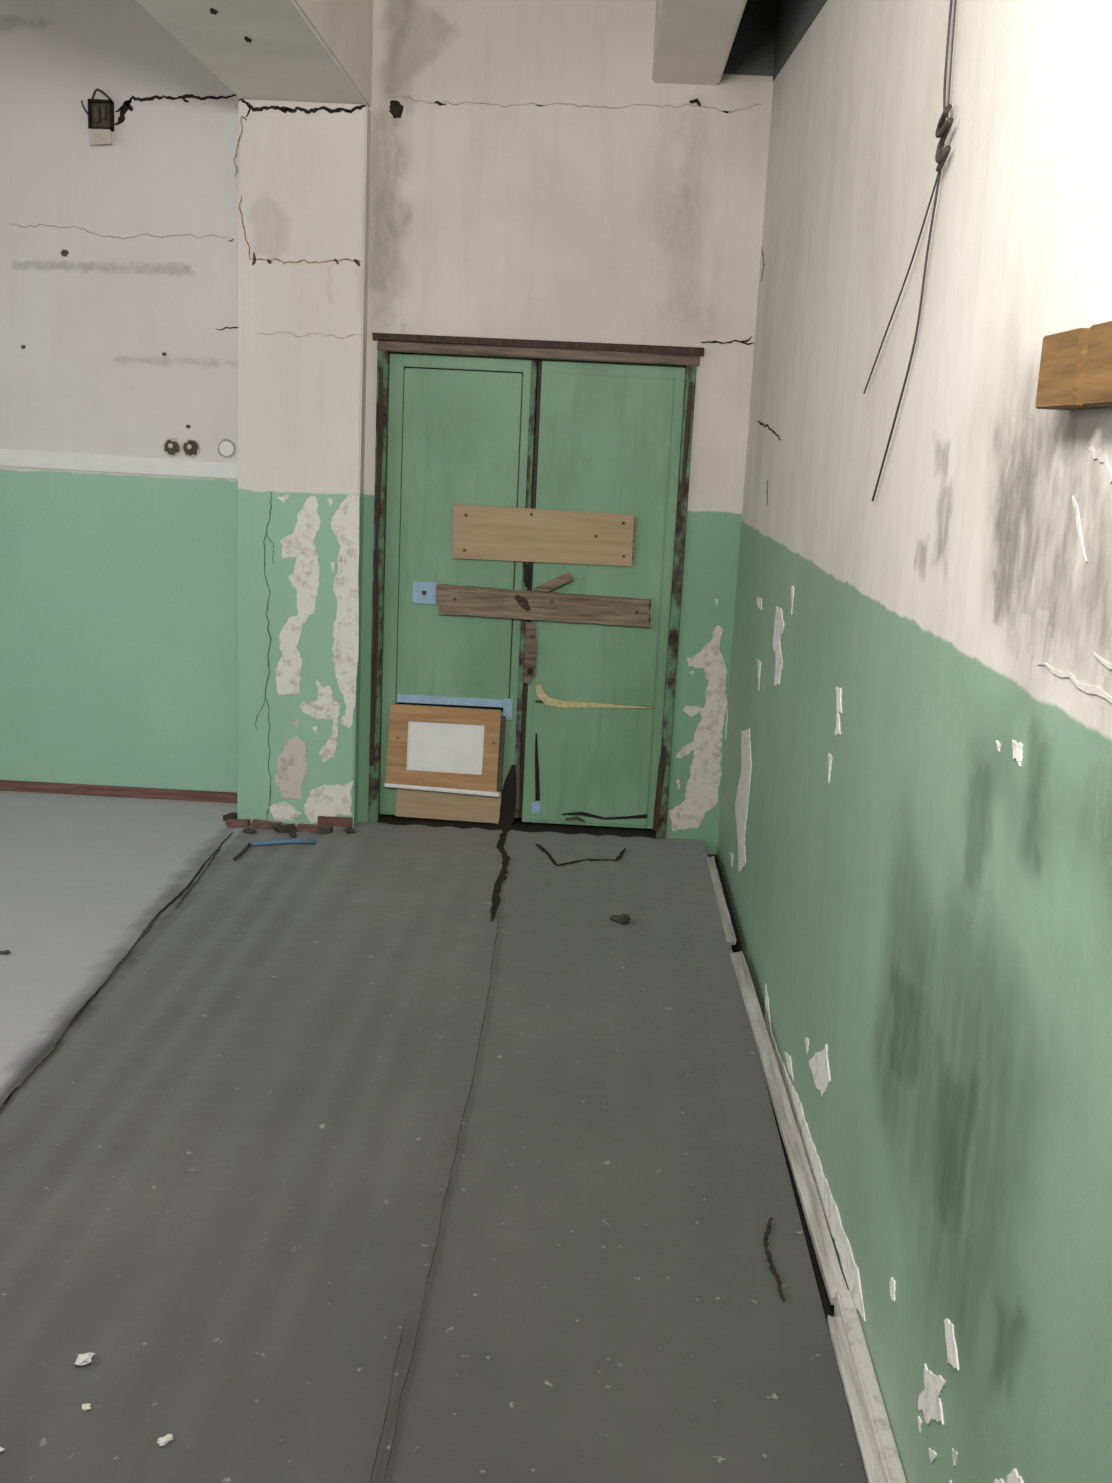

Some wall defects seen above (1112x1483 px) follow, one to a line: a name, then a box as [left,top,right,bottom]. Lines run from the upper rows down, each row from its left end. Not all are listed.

crack [11,94,762,267]
crack [255,493,274,821]
peeling [269,367,383,824]
peeling [653,625,752,872]
crack [0,831,233,1111]
crack [370,829,626,1483]
peeling [764,984,866,1321]
peeling [917,1318,959,1483]
peeling [993,1468,1024,1483]